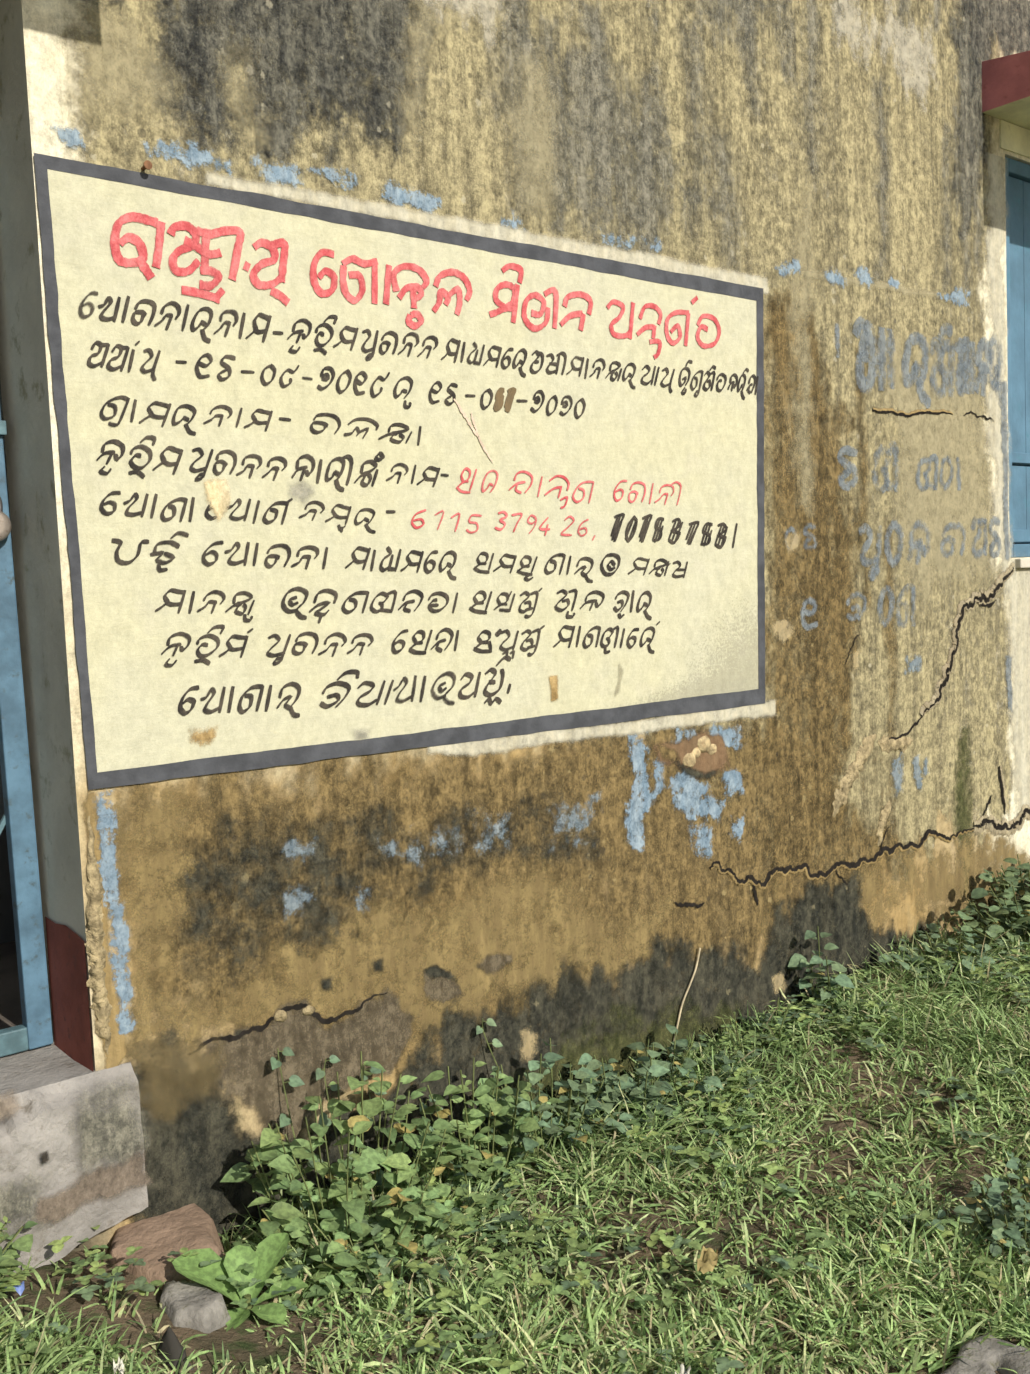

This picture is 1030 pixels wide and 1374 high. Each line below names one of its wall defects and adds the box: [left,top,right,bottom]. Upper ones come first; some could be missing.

crack [873,407,993,420]
water stain [64,0,1030,1166]
crack [889,562,1015,740]
peeling [624,721,745,858]
crack [675,766,1030,908]
spalling [424,966,462,1003]
spalling [478,954,512,974]
water stain [79,1064,298,1237]
water stain [285,1158,361,1189]